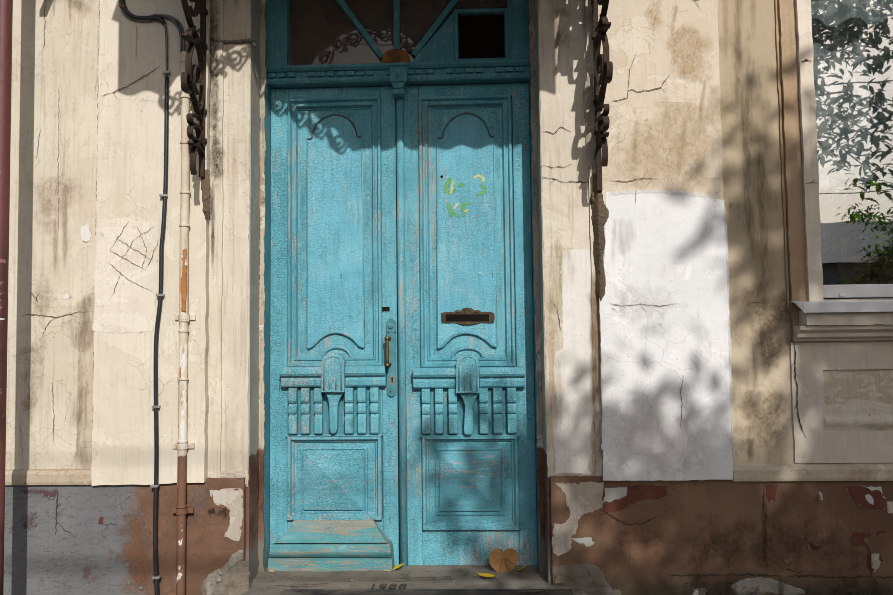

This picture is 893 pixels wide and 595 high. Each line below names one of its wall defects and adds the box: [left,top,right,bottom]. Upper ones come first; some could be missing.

crack [614,52,668,101]
crack [26,293,93,336]
crack [790,344,806,437]
flaking render [201,470,250,595]
flaking render [552,481,668,556]
peeling [850,531,883,572]
peeling [844,486,893,516]